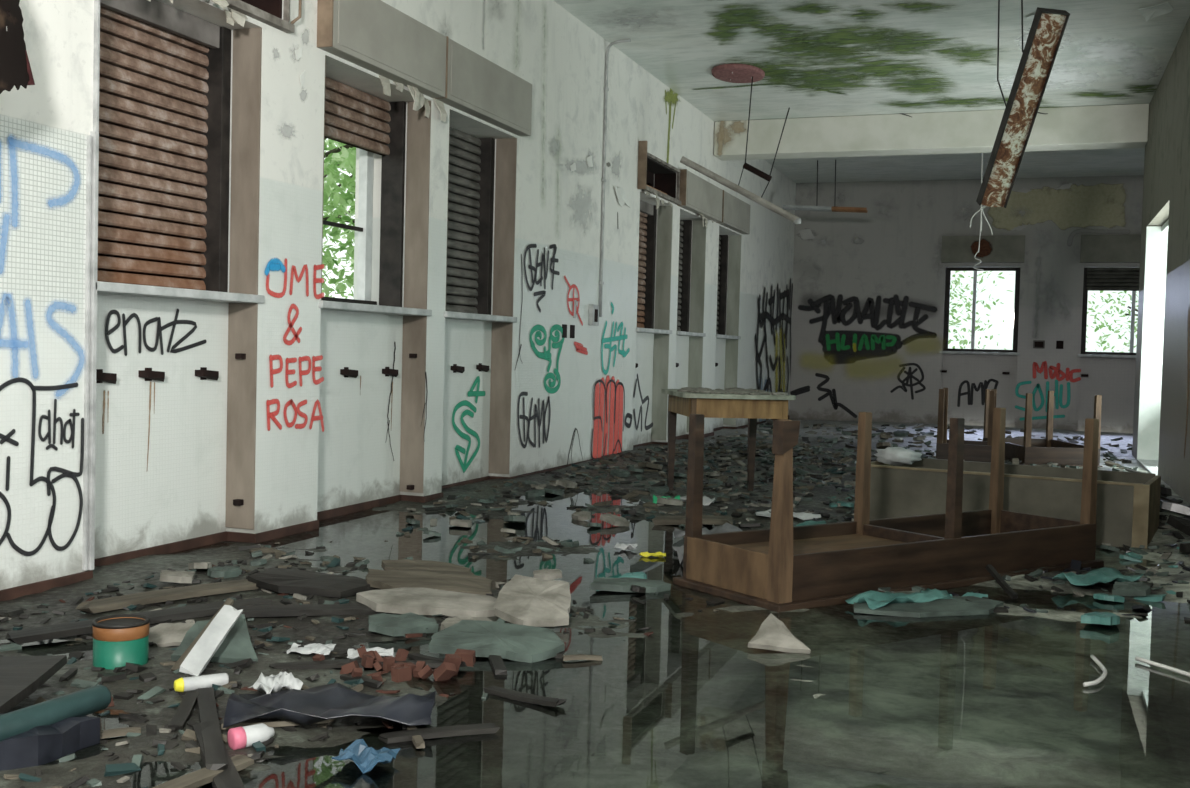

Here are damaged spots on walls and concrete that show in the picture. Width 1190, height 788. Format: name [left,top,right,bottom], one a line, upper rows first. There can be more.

leakage [694,3,1008,108]
leakage [1071,85,1156,98]